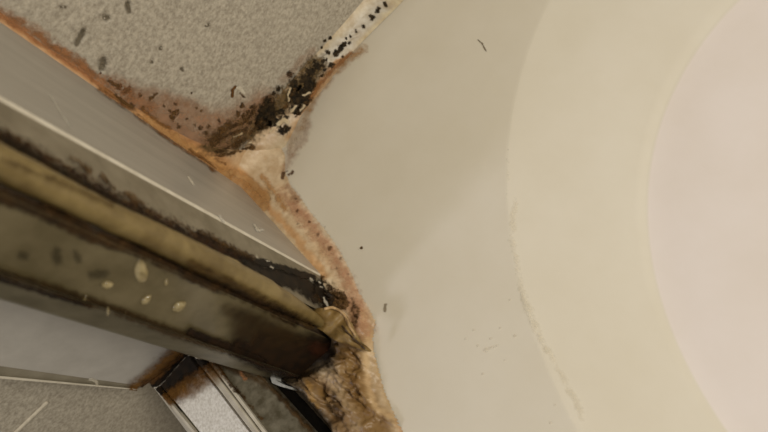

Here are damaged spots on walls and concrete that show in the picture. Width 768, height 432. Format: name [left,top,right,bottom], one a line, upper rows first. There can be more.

rust [0,10,158,113]
leakage [0,1,388,327]
leakage [0,189,331,379]